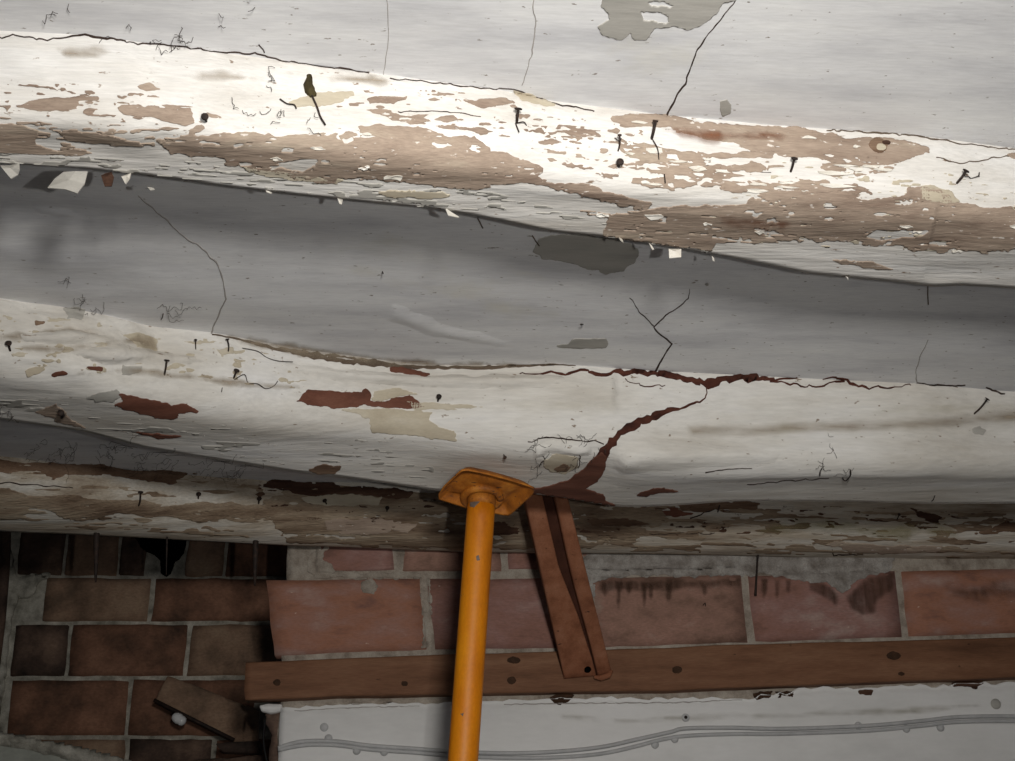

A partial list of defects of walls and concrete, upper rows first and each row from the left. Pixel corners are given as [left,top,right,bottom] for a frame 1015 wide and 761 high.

peeling [598,0,736,40]
crack [0,0,594,112]
crack [666,1,735,116]
crack [398,109,481,117]
peeling [0,82,1015,275]
crack [138,195,1005,468]
peeling [0,365,477,535]
spalling [533,452,615,506]
crack [705,468,829,485]
peeling [655,501,760,517]
hole [135,537,187,577]
leakage [583,554,895,611]